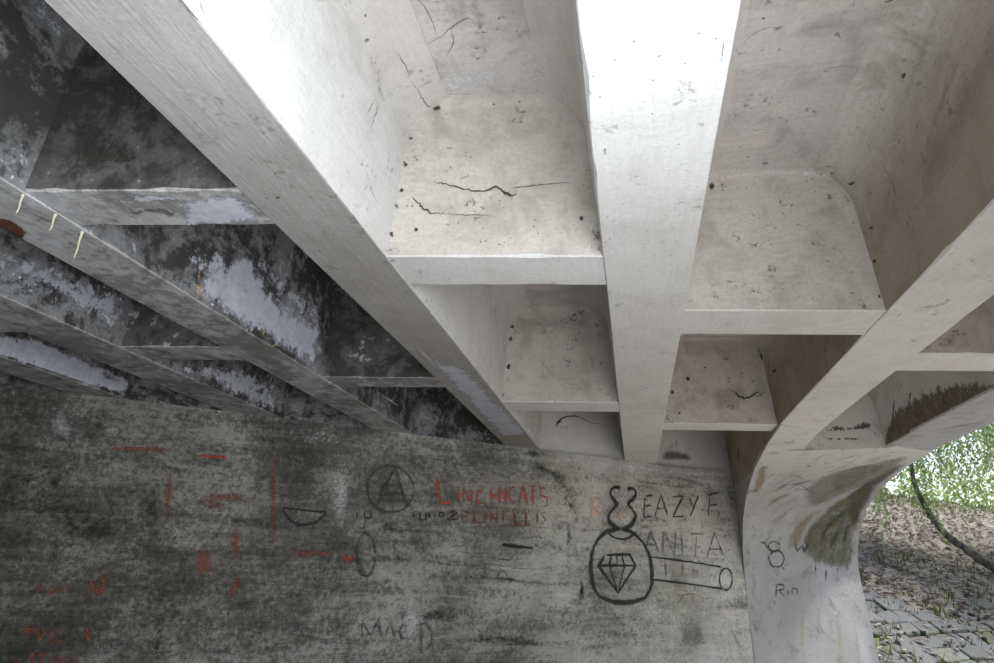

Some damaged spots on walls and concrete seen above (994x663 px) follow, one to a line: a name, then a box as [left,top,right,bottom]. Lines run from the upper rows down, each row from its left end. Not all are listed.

crack [413,181,570,216]
crack [732,360,777,418]
damp [797,456,901,548]